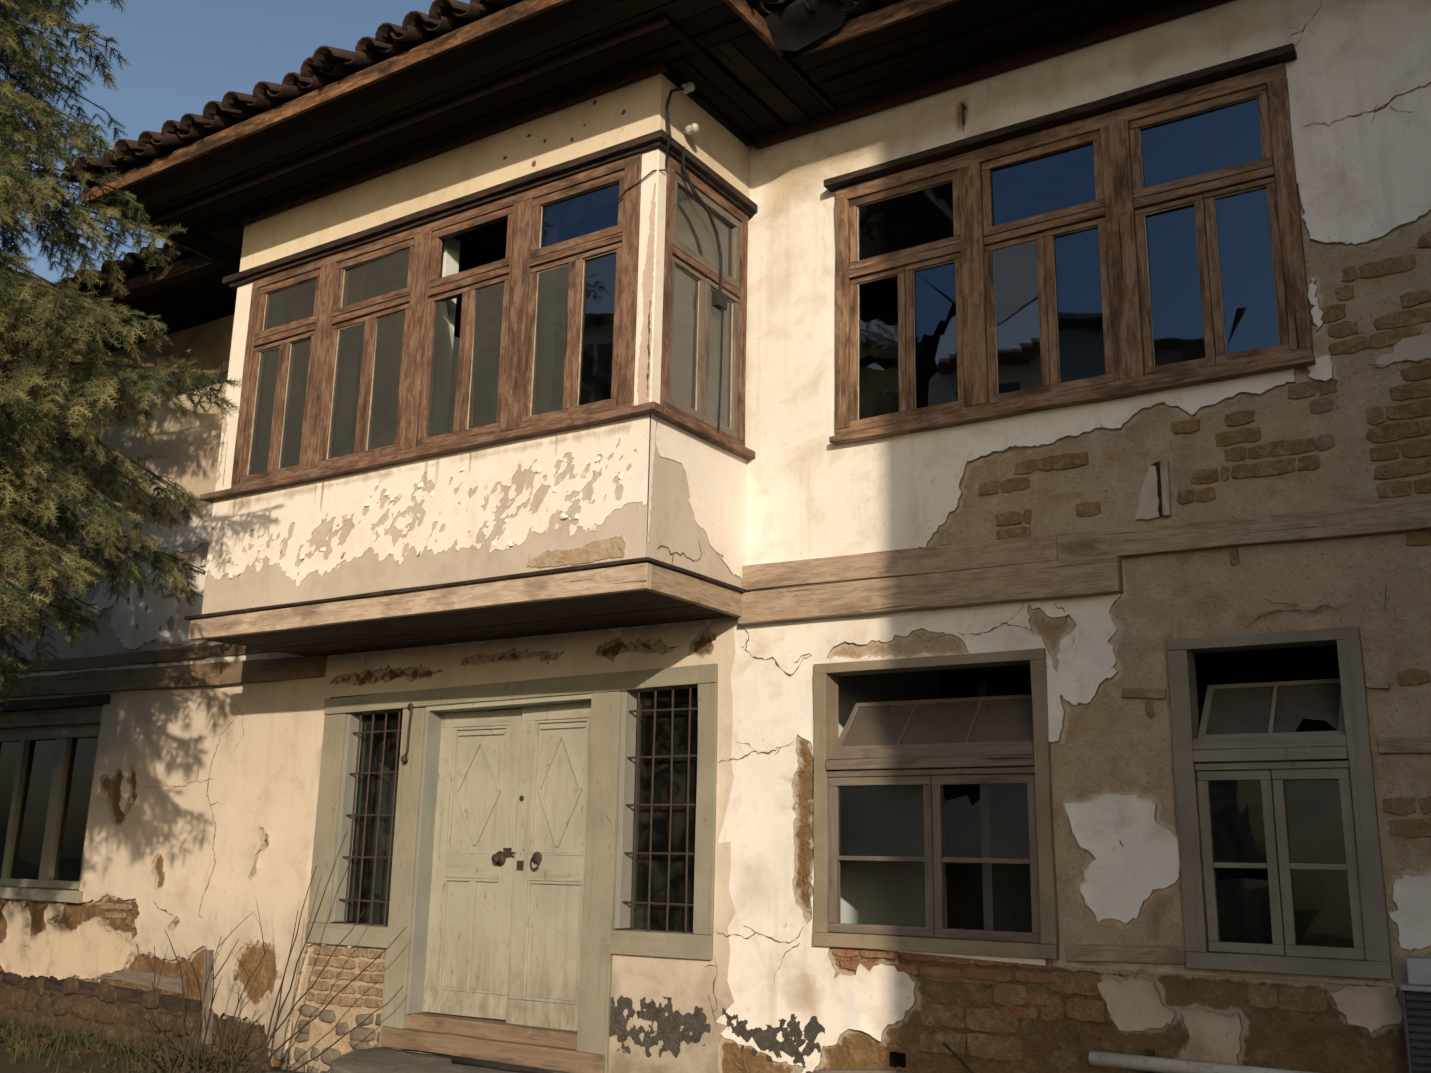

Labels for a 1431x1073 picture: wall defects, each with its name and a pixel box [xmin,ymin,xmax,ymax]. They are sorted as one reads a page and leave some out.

crack [1304,82,1431,127]
peeling [139,370,228,408]
peeling [637,183,656,404]
spalling [926,183,1431,547]
peeling [0,421,742,676]
peeling [328,664,442,686]
crack [742,627,812,676]
spalling [99,766,137,826]
spalling [151,854,165,892]
crack [144,703,244,918]
spalling [594,529,1431,1073]
spalling [0,887,386,1073]